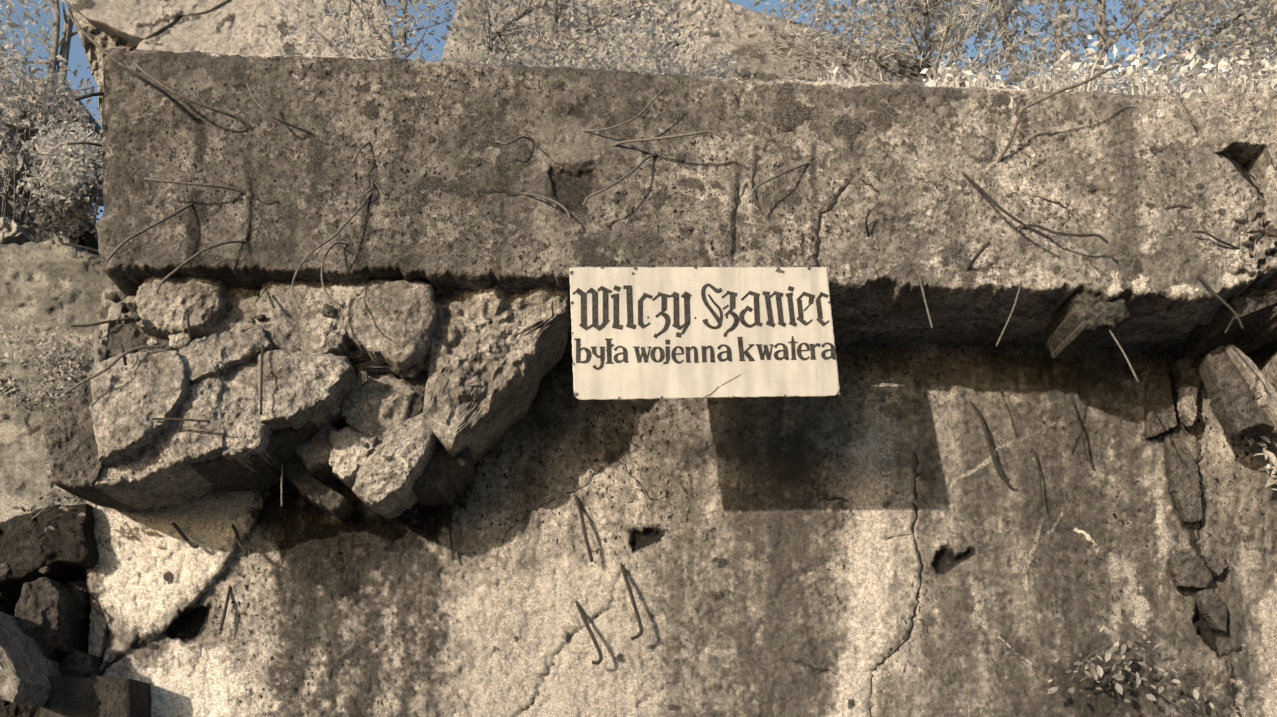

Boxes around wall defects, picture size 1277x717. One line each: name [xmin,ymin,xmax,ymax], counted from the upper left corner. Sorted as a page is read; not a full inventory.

spalling [1224,345,1277,433]
leakage [93,491,254,640]
leakage [131,543,448,717]
spalling [630,527,665,553]
leakage [684,378,899,717]
crack [785,435,929,717]
spalling [932,547,975,575]
spalling [1193,602,1219,656]